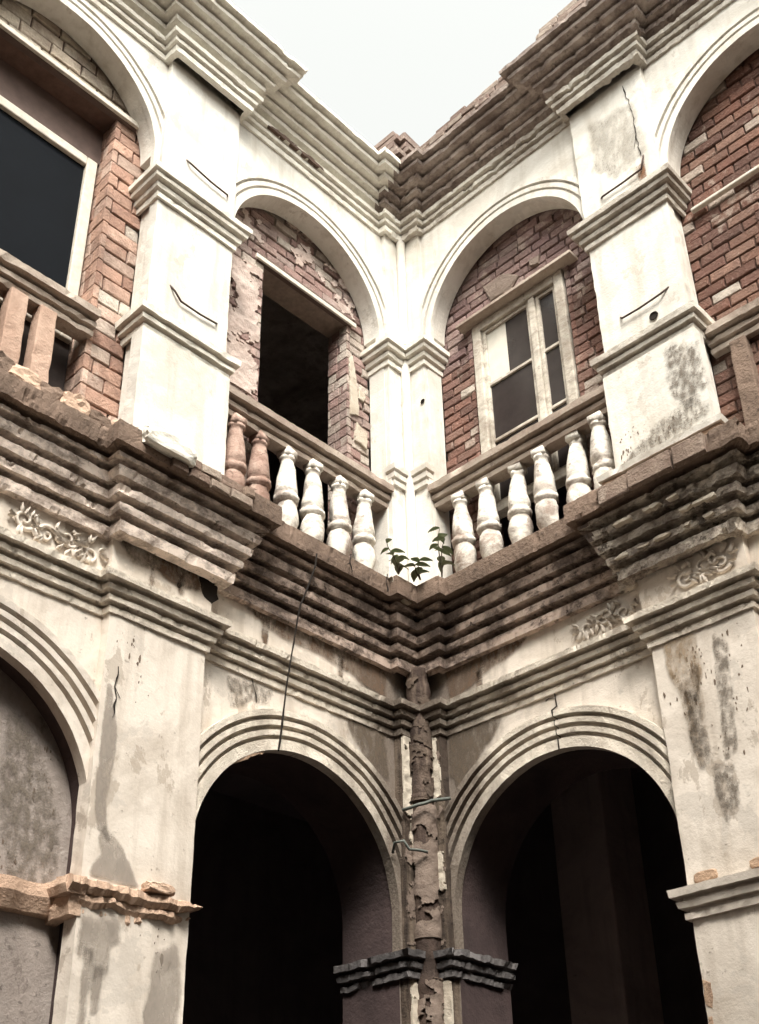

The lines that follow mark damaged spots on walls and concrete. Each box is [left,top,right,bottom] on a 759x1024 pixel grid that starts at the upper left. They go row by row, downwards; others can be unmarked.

crack [622,86,641,154]
flaking render [226,254,262,395]
flaking render [286,221,355,321]
water stain [627,345,707,461]
water stain [1,715,58,884]
water stain [91,684,137,886]
crack [112,666,120,716]
flaking render [401,676,447,946]
crack [545,693,561,749]
water stain [664,635,738,820]
flaking render [410,977,454,1024]